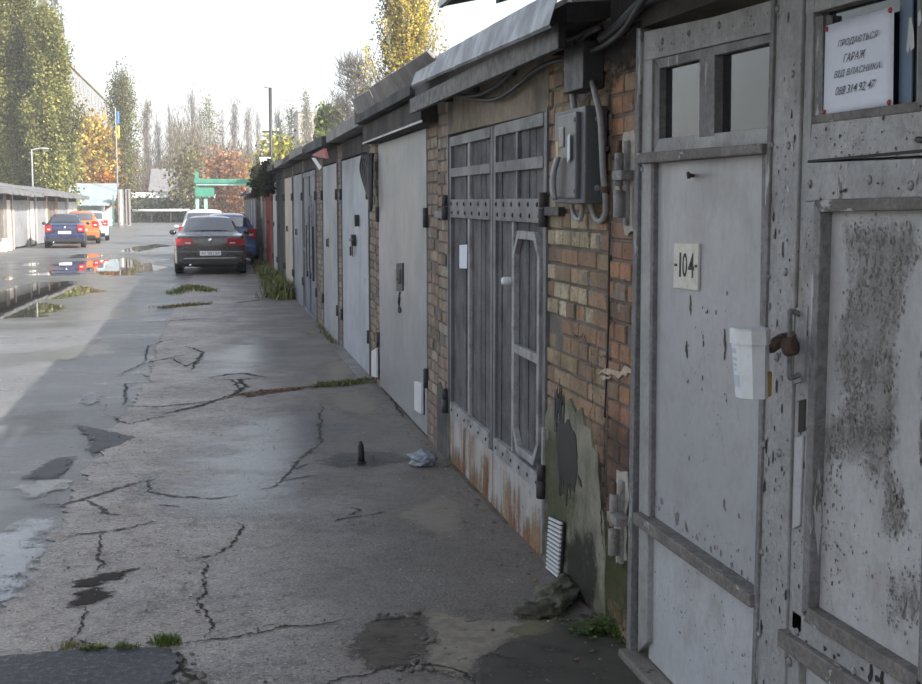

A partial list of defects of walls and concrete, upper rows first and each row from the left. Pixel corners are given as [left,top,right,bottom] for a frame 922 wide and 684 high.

crack [114,318,263,424]
crack [263,383,355,489]
peeling [822,213,922,590]
crack [58,606,93,651]
crack [35,477,238,572]
crack [176,522,351,644]
crack [327,657,476,684]
rust [449,424,542,558]
peeling [348,610,644,684]
leakage [565,534,597,606]
peeling [876,547,921,645]